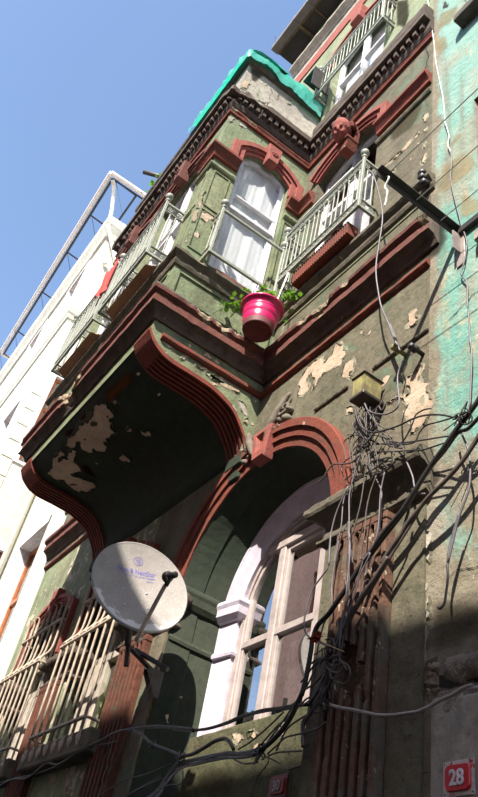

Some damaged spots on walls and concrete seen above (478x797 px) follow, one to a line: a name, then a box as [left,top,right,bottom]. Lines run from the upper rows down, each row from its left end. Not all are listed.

peeling [404,308,421,329]
peeling [297,340,356,397]
peeling [386,361,435,435]
peeling [46,398,152,493]
peeling [426,525,434,564]
spalling [423,583,478,703]
peeling [232,729,265,748]